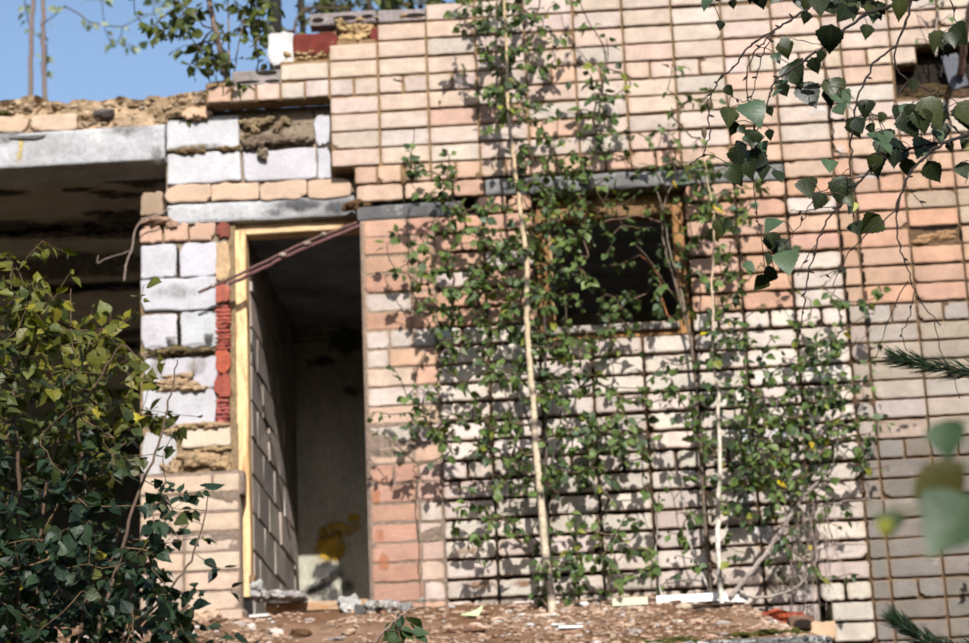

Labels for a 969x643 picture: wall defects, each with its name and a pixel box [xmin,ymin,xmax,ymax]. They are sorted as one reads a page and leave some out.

spalling [895,51,969,102]
spalling [701,635,832,643]